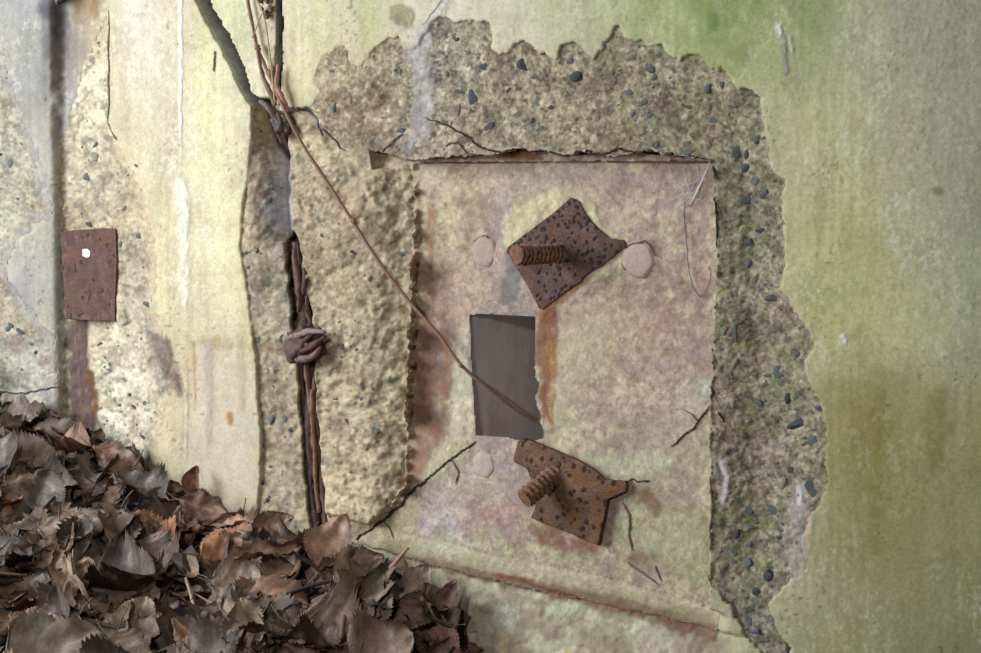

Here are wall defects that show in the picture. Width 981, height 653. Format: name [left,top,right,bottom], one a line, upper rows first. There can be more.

crack [196,0,345,151]
crack [425,117,715,172]
crack [711,197,719,244]
corrosion [64,320,97,434]
spalling [241,4,829,653]
corrosion [535,278,587,424]
crack [363,442,475,539]
damp [786,485,812,573]
corrosion [436,563,717,639]